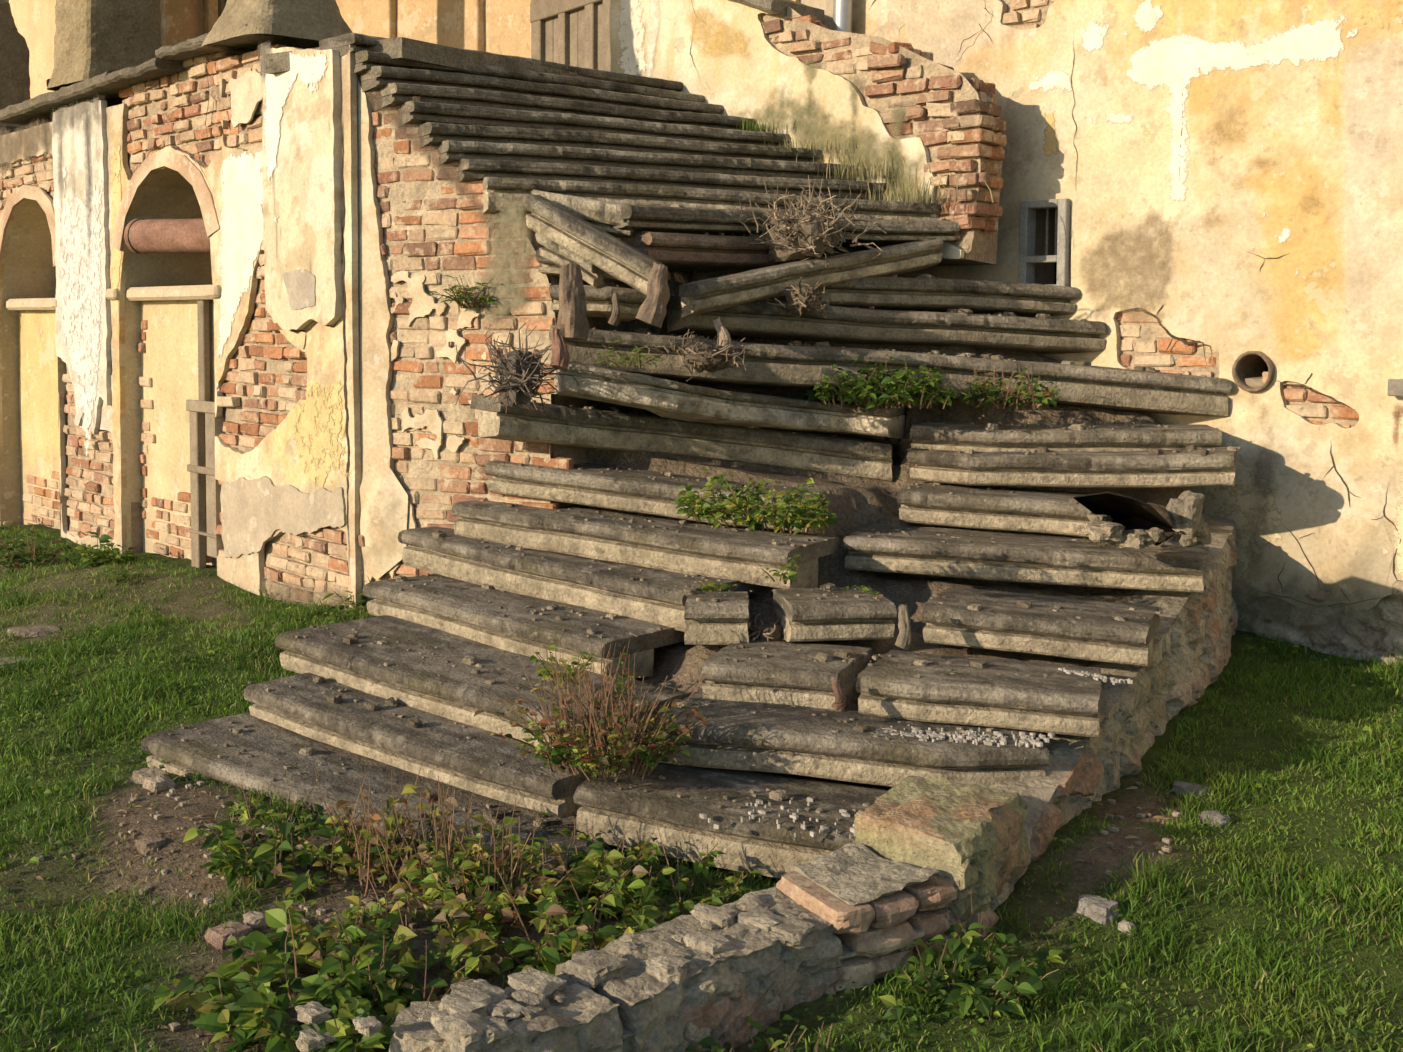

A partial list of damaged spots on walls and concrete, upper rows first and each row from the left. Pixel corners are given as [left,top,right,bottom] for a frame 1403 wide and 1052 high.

flaking render [761,0,1055,242]
peeling [1080,0,1403,218]
flaking render [0,44,367,611]
flaking render [1116,308,1220,378]
flaking render [1262,372,1359,428]
crack [1278,373,1352,409]
flaking render [1073,440,1403,665]
crack [1255,441,1401,606]